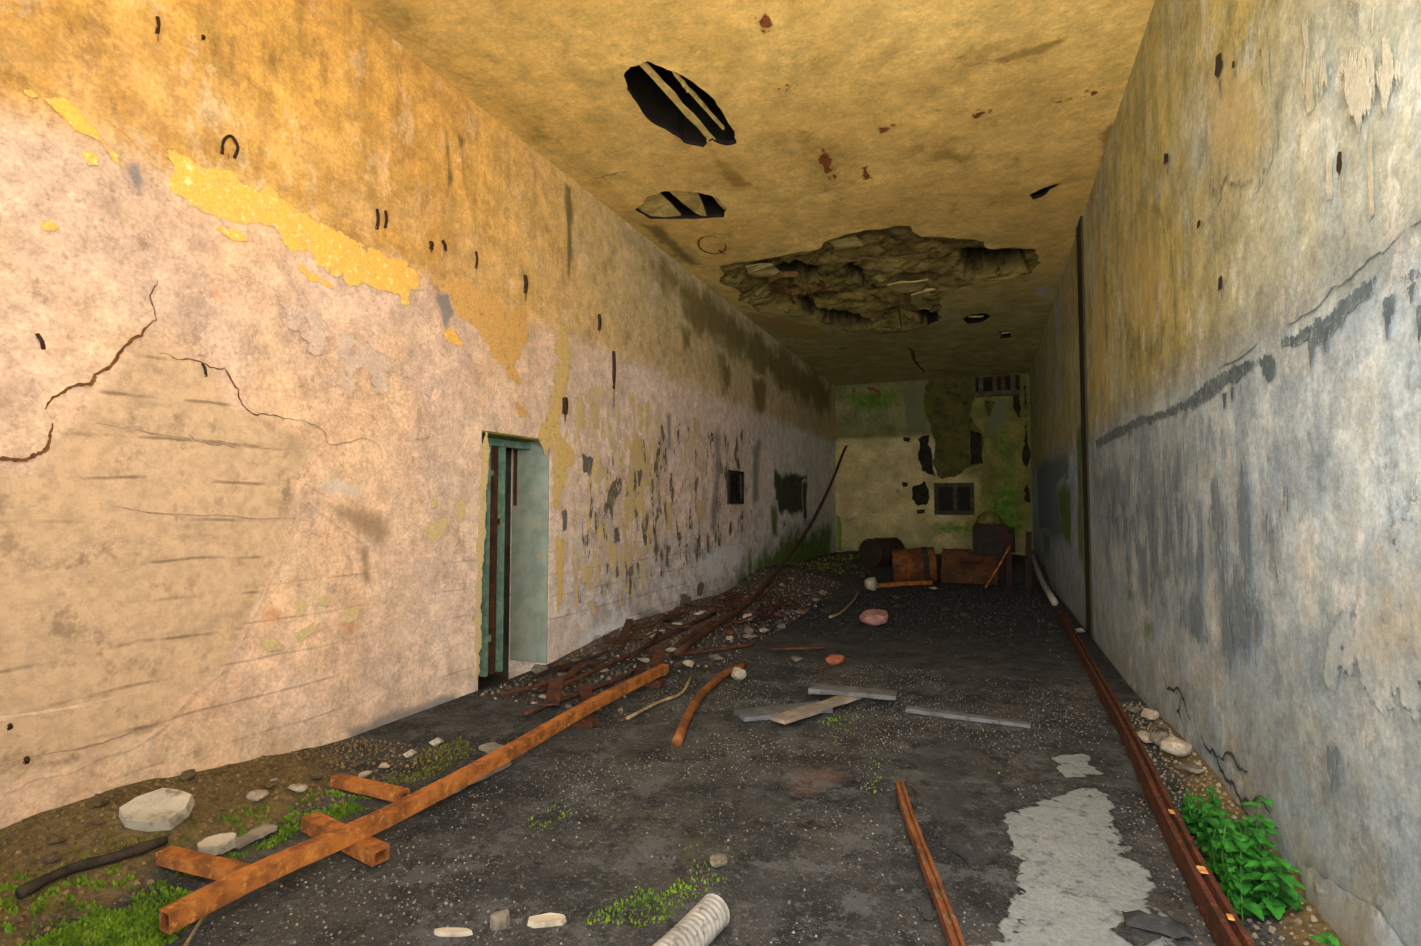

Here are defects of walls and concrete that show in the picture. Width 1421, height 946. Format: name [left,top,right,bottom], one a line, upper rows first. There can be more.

peeling [24,89,148,193]
peeling [1298,7,1401,132]
peeling [40,221,60,231]
crack [0,279,380,462]
peeling [165,145,761,628]
spalling [720,226,1041,335]
peeling [1095,267,1421,448]
crack [110,485,300,649]
spalling [1324,475,1421,721]
spalling [341,688,459,738]